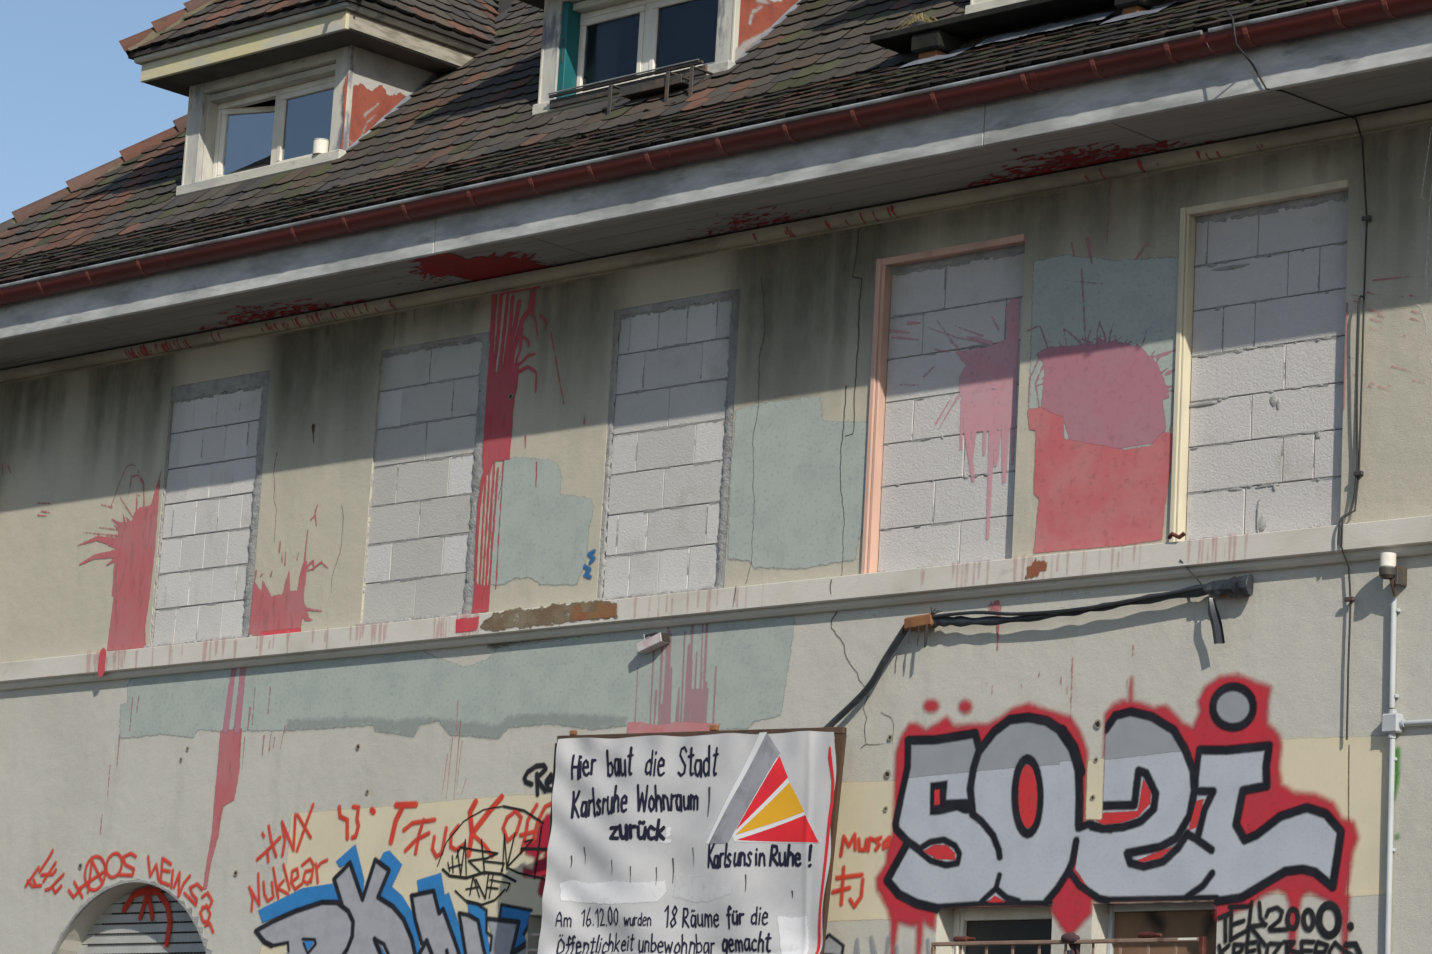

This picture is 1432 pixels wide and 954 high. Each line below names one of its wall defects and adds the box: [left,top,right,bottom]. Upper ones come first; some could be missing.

spalling [480,600,618,631]
crack [830,223,894,748]